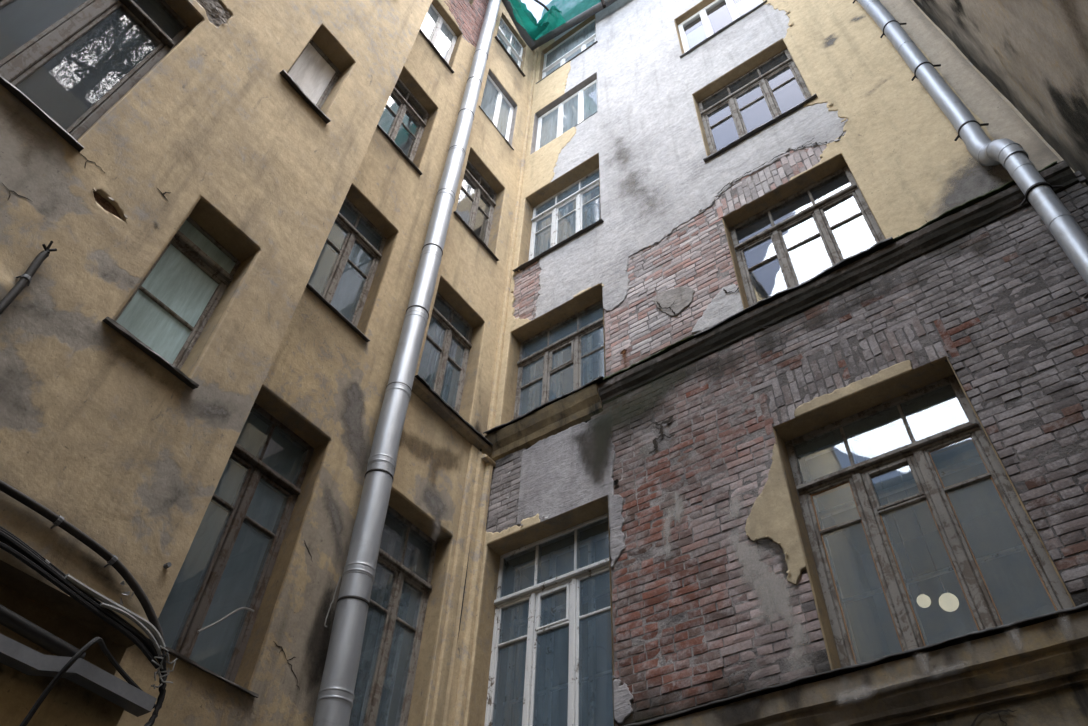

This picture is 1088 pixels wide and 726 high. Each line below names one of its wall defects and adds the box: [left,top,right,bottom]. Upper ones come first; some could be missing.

spalling [196,0,231,27]
flaking render [444,0,498,47]
water stain [950,0,963,27]
water stain [1048,87,1088,146]
spalling [93,187,127,219]
peeling [512,0,848,377]
water stain [940,158,1008,213]
flaking render [1056,171,1088,237]
flaking render [486,205,1088,726]
crack [274,642,300,690]